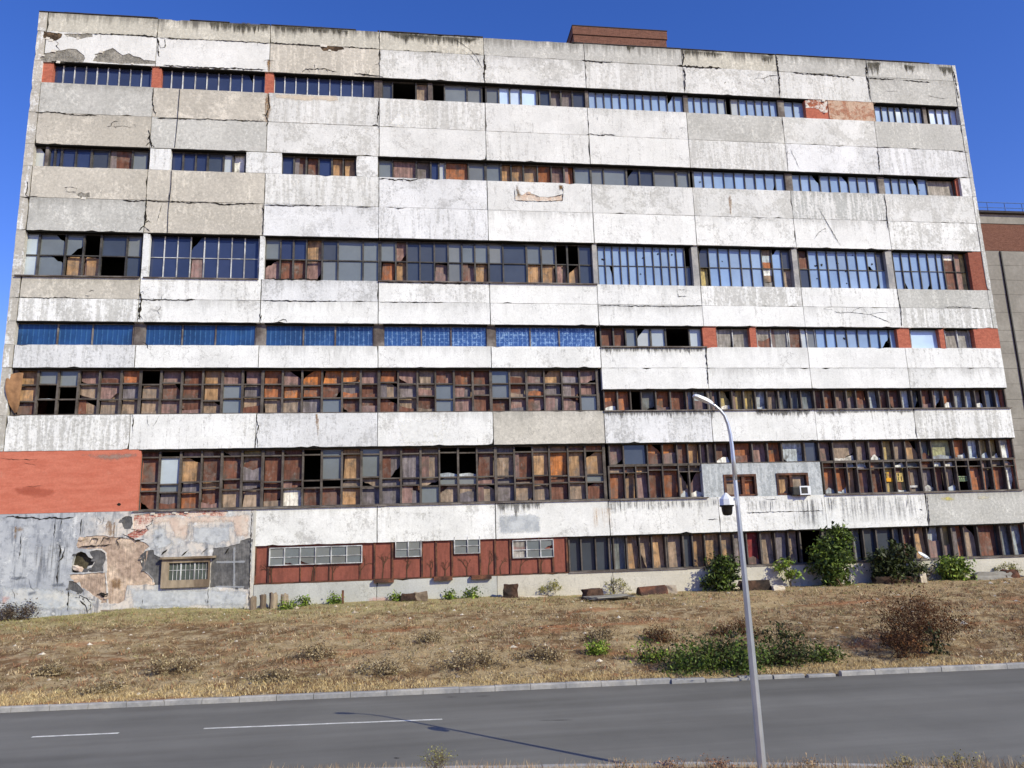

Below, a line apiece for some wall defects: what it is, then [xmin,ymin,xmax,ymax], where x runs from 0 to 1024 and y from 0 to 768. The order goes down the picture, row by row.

spalling [40,31,156,64]
crack [677,53,725,89]
peeling [805,99,828,113]
flaking render [66,503,227,604]
flaking render [210,538,253,589]